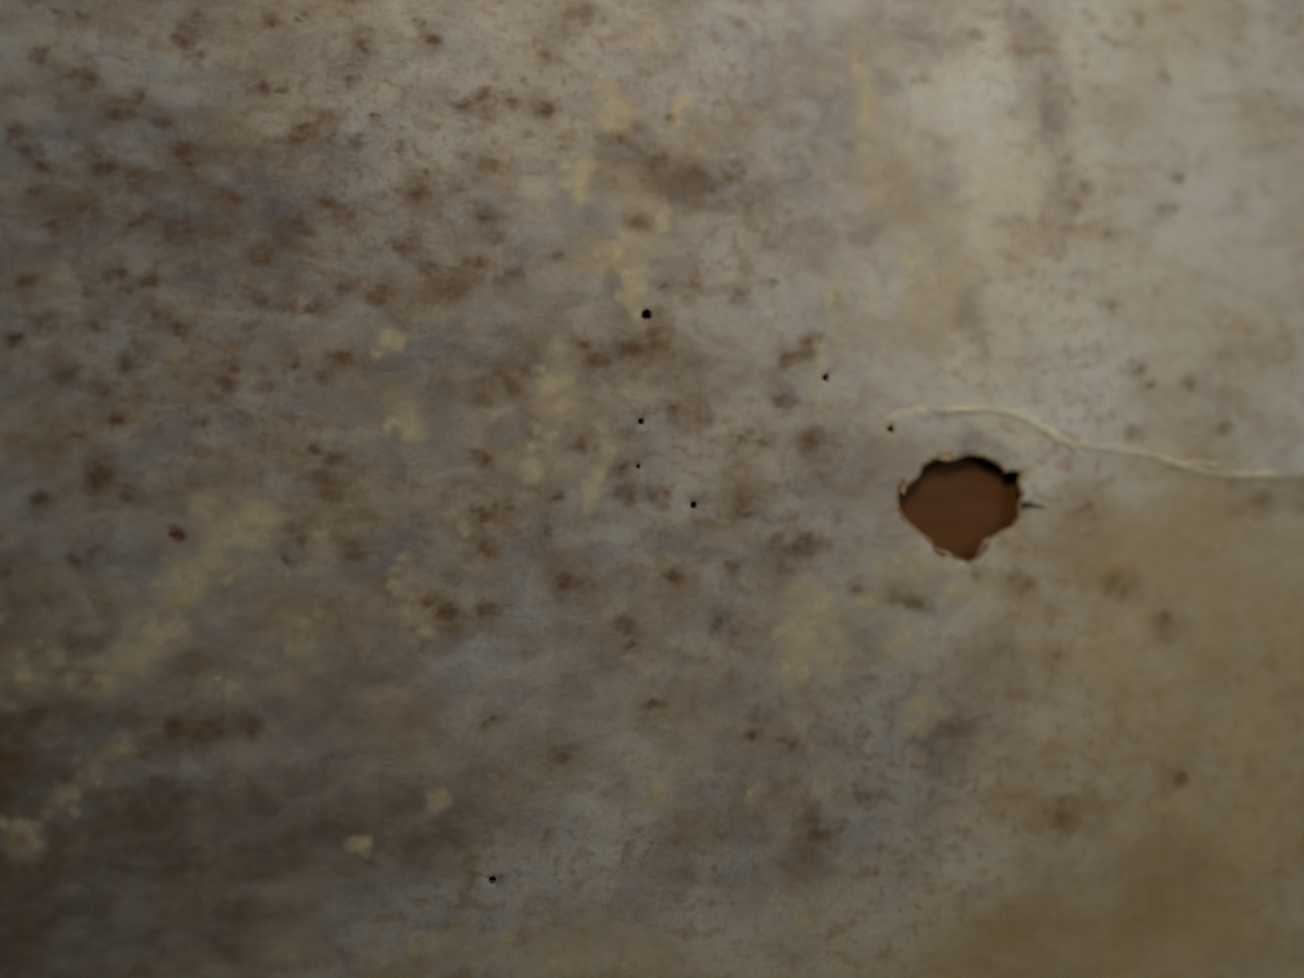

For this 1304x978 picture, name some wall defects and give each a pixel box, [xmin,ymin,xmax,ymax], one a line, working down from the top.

crack [949,406,1075,448]
crack [1163,458,1276,478]